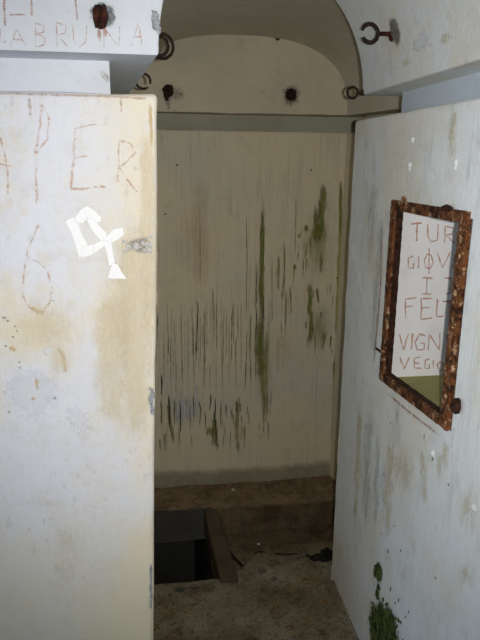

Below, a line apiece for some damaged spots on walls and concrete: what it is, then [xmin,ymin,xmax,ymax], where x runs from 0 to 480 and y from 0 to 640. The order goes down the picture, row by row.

rust [98,3,115,38]
rust [390,19,400,44]
leakage [99,243,158,416]
leakage [245,228,267,412]
leakage [160,375,221,445]